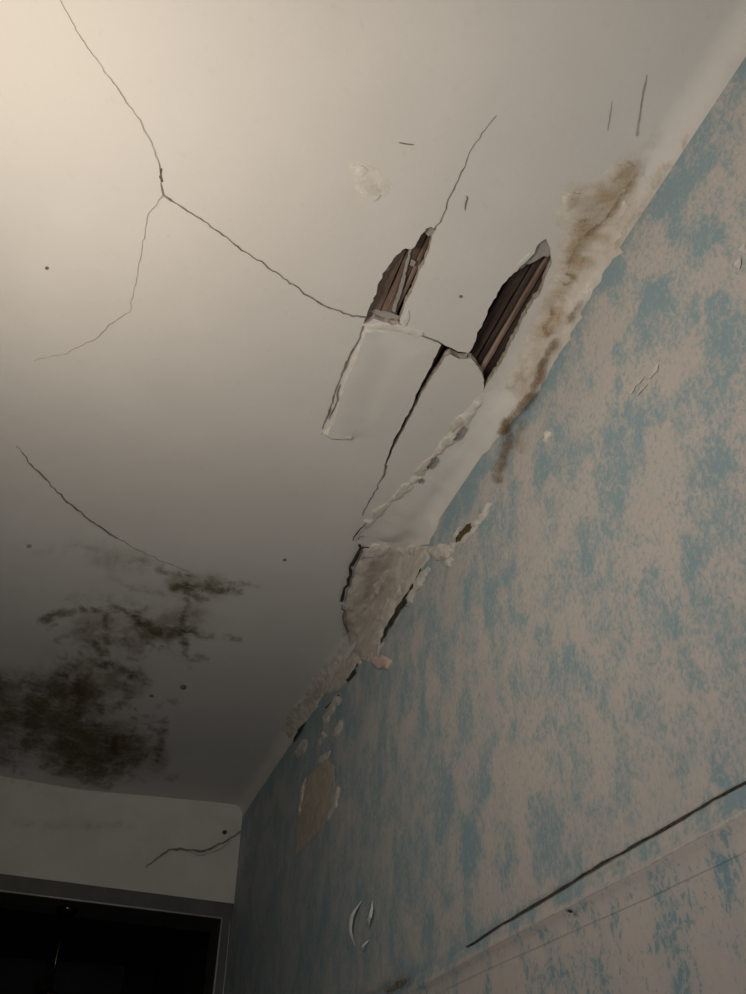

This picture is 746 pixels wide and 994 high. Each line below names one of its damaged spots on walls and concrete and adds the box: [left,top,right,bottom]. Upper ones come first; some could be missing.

crack [34,0,366,429]
crack [433,116,496,230]
peeling [363,156,647,529]
crack [16,446,188,572]
crack [340,335,468,643]
crack [293,722,306,742]
crack [325,664,358,709]
spalling [283,541,454,759]
crack [146,831,241,868]